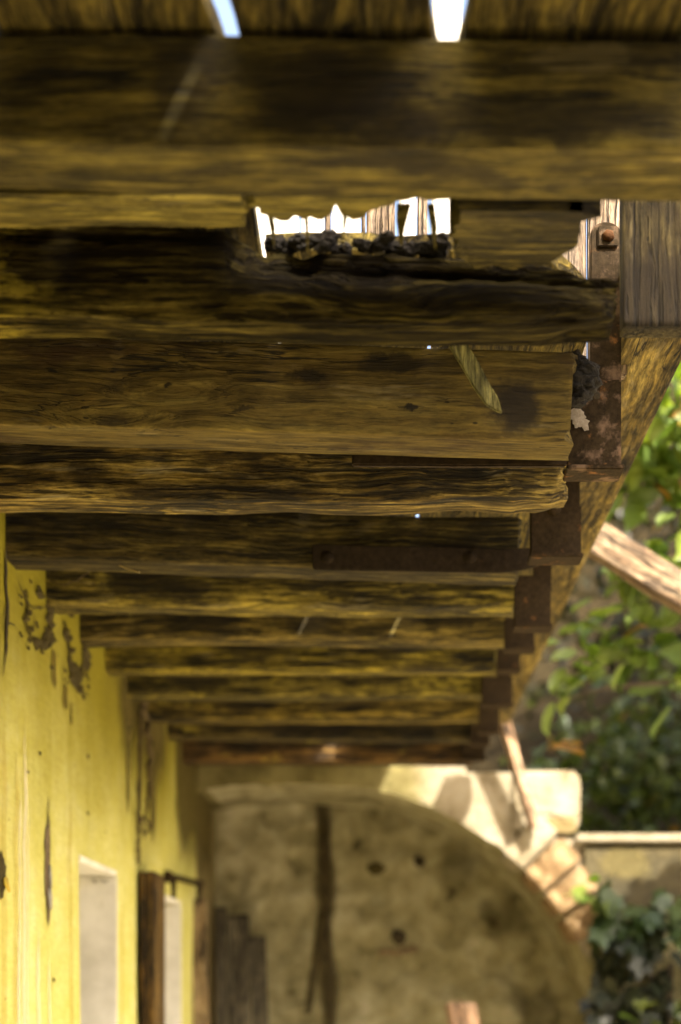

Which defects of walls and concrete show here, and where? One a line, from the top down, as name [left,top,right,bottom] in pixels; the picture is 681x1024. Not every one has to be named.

flaking render [19,579,93,700]